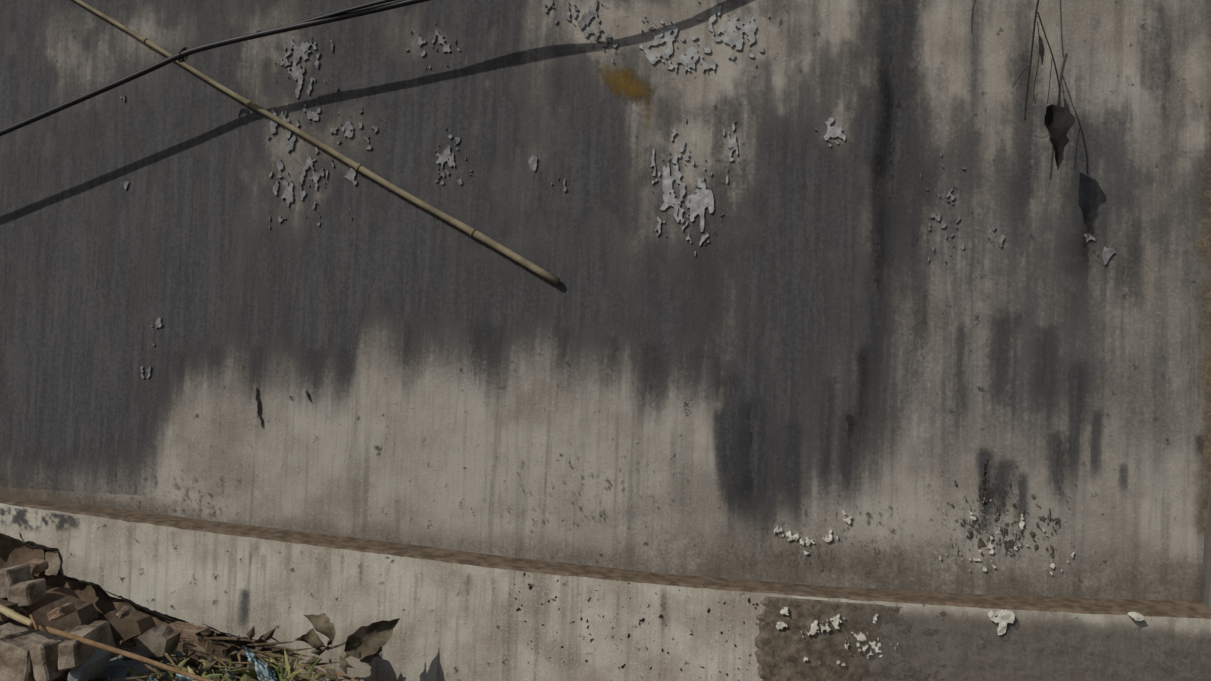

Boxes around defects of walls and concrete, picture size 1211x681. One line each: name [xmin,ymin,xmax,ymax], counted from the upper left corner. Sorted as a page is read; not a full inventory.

peeling [267,29,388,229]
peeling [650,118,739,256]
water stain [0,0,1211,537]
crack [255,387,263,428]
spalling [719,587,903,681]